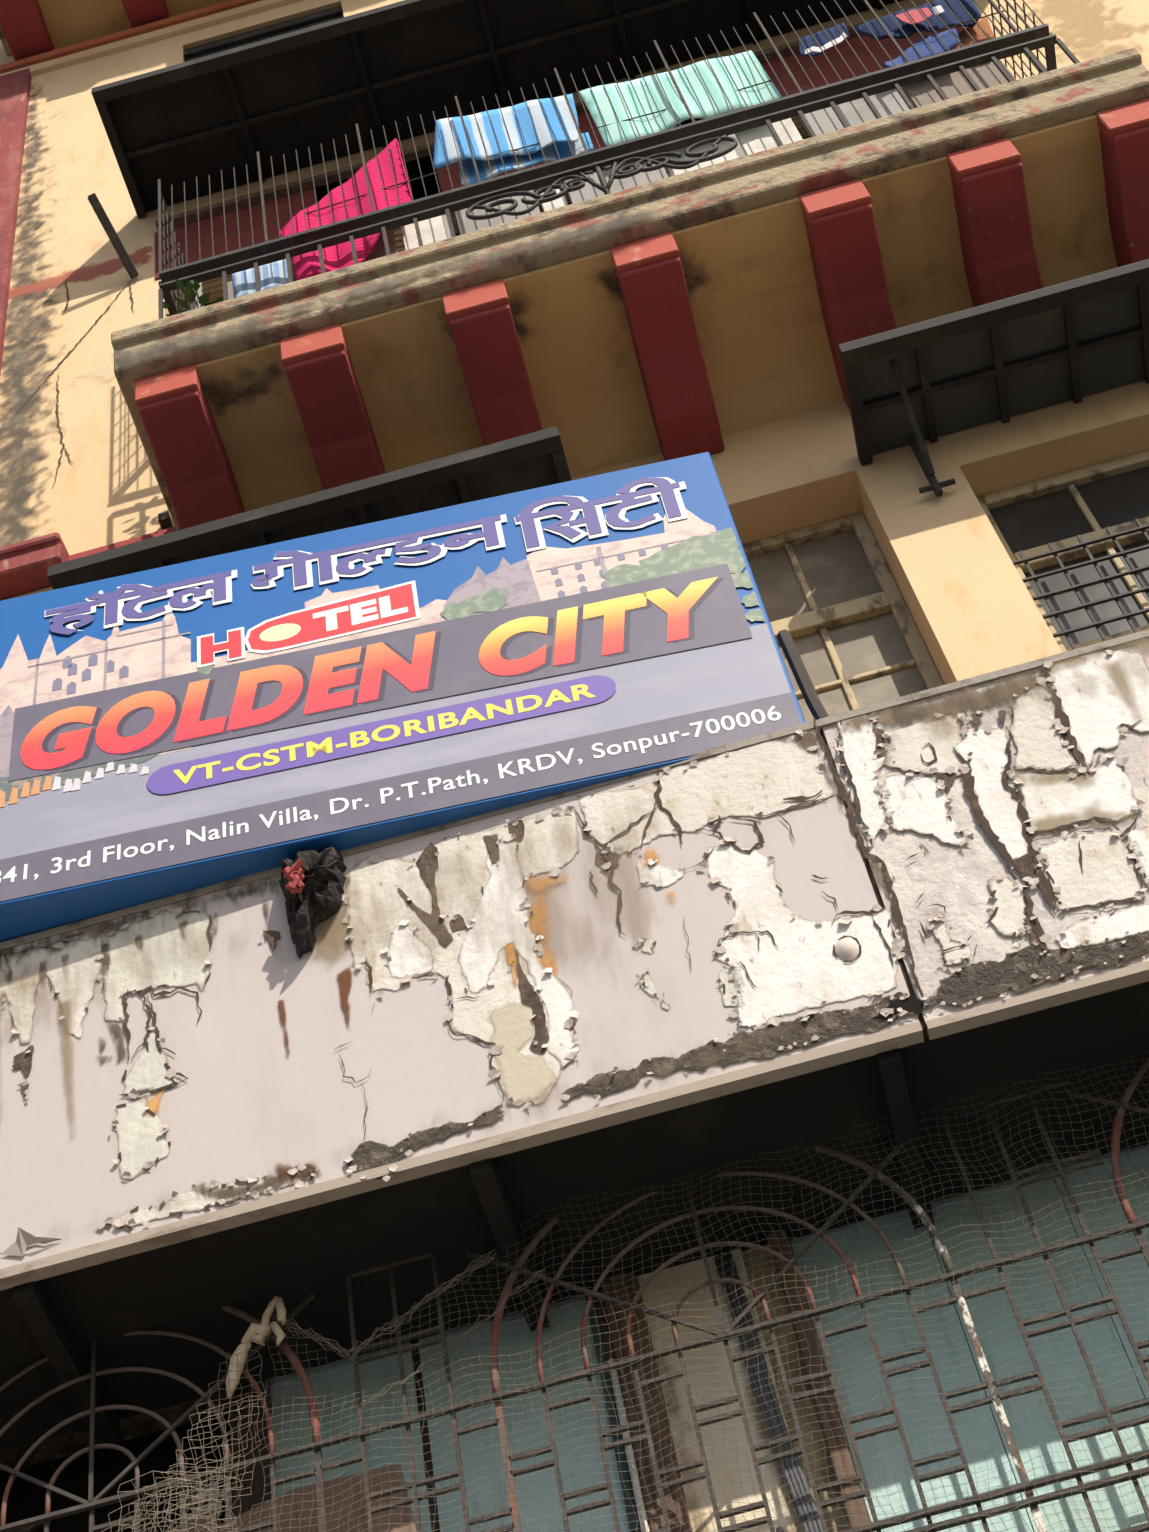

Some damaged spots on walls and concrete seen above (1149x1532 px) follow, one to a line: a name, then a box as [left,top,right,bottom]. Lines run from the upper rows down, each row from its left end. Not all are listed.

damp [0,93,58,547]
crack [13,280,135,485]
damp [115,210,661,363]
damp [59,1002,71,1112]
damp [0,910,150,982]
peeling [0,907,213,1099]
damp [98,1023,126,1063]
peeling [109,1027,178,1179]
peeling [259,930,280,954]
peeling [342,649,1149,1182]
peeling [2,1227,59,1256]
peeling [96,1164,316,1230]